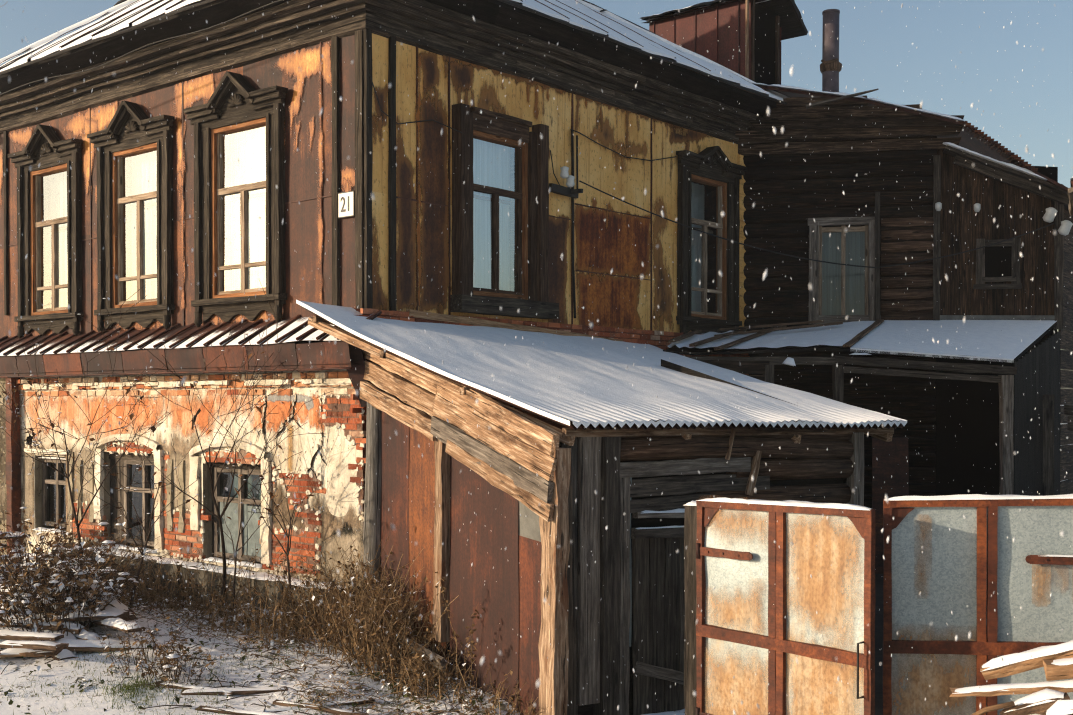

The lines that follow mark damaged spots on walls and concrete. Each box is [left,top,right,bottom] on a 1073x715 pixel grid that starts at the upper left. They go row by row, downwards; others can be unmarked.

rust [372,51,713,331]
spalling [34,395,211,562]
spalling [201,448,326,579]
spalling [176,392,366,522]
rust [710,591,761,633]
rust [709,508,765,536]
rust [791,515,858,638]
rust [706,655,768,715]
rust [789,653,864,715]
rust [891,654,976,715]